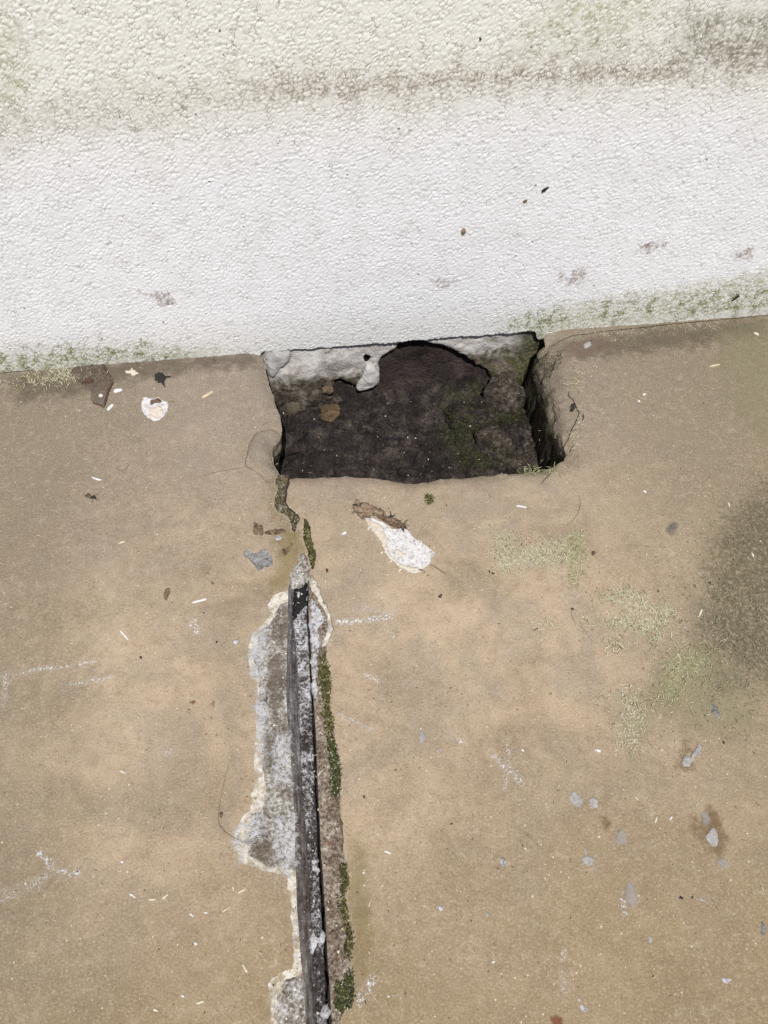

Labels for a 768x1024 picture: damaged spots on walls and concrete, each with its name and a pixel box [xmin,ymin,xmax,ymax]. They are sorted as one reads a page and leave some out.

crack [202,422,316,569]
peeling [263,350,291,377]
spalling [272,418,288,481]
peeling [356,362,380,391]
spalling [523,347,566,472]
spalling [244,549,273,570]
spalling [232,590,306,1024]
spalling [308,575,355,1024]